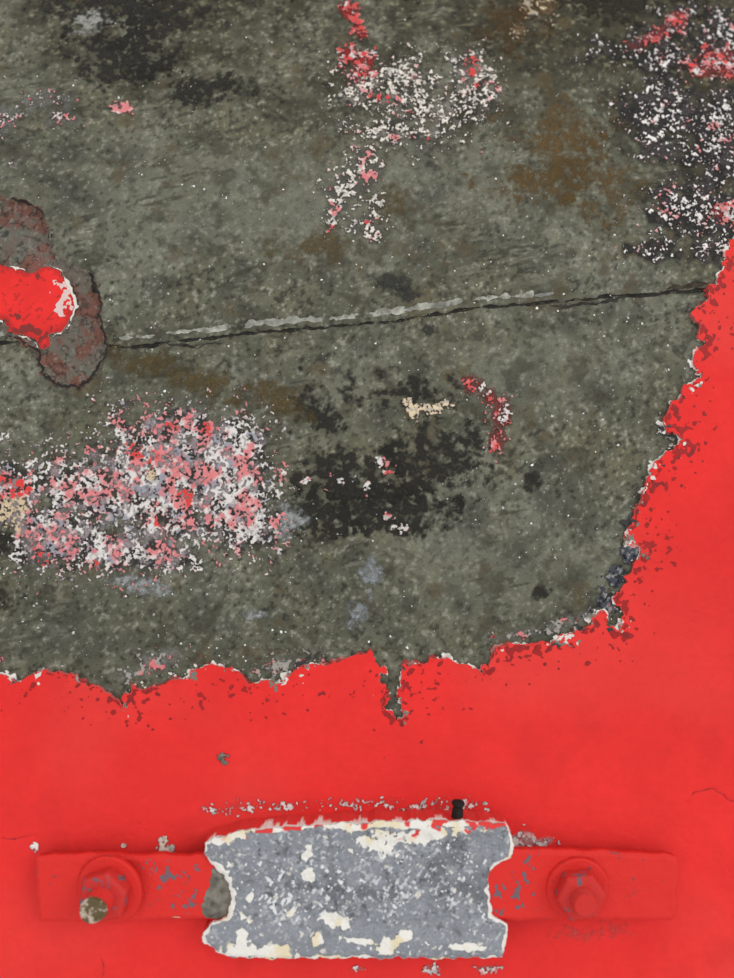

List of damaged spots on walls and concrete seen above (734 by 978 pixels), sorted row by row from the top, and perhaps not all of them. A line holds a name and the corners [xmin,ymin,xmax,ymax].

crack [0,332,19,345]
peeling [0,0,734,731]
crack [109,281,710,349]
peeling [201,796,561,976]